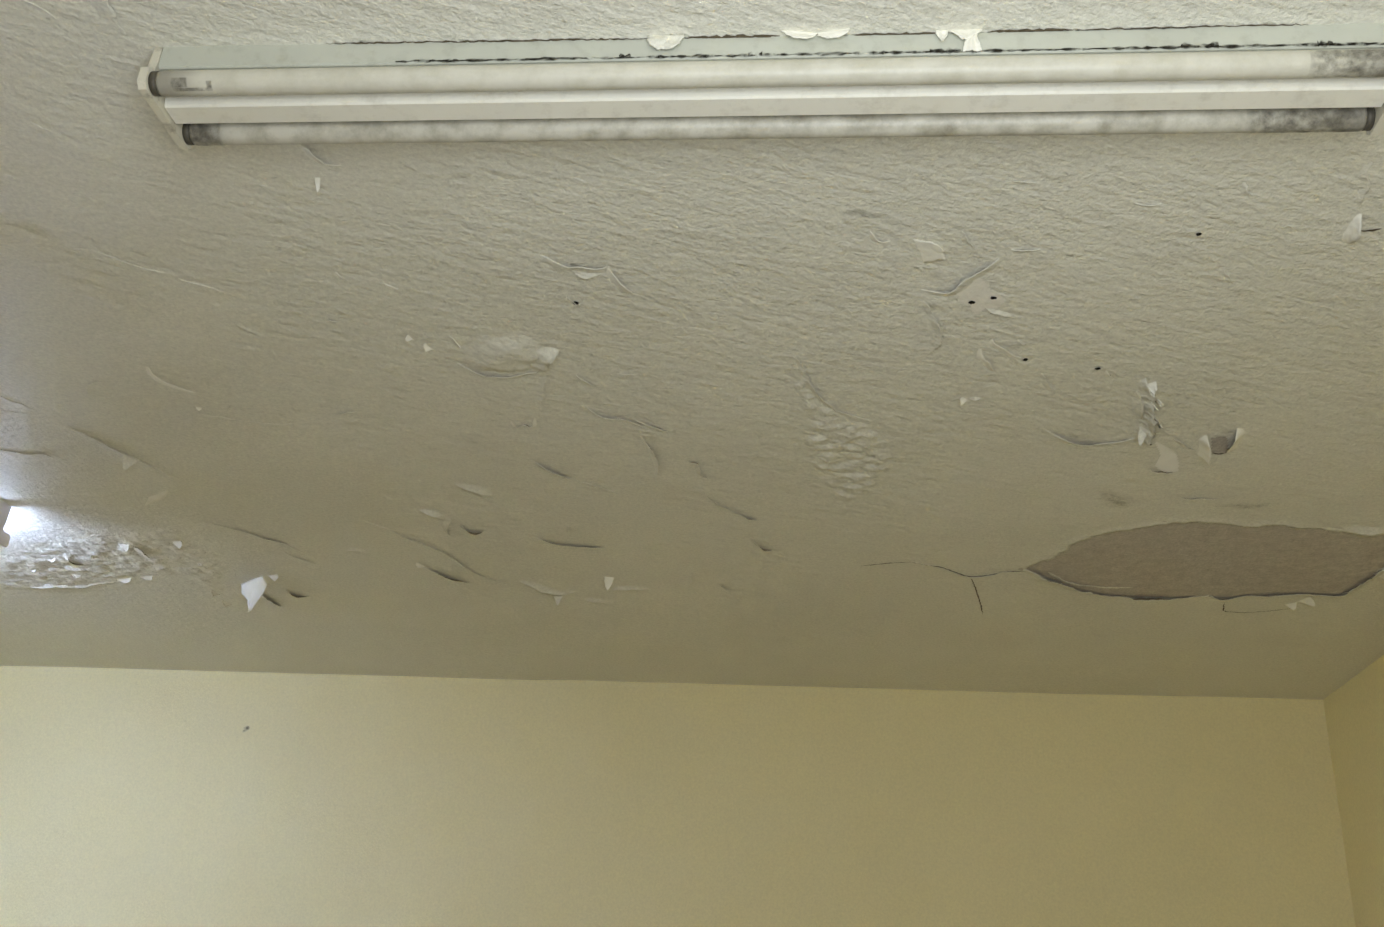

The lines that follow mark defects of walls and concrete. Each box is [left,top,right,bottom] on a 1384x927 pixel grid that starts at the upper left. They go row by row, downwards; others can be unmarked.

peeling [0,523,309,612]
crack [864,562,1024,615]
spalling [1017,515,1384,601]